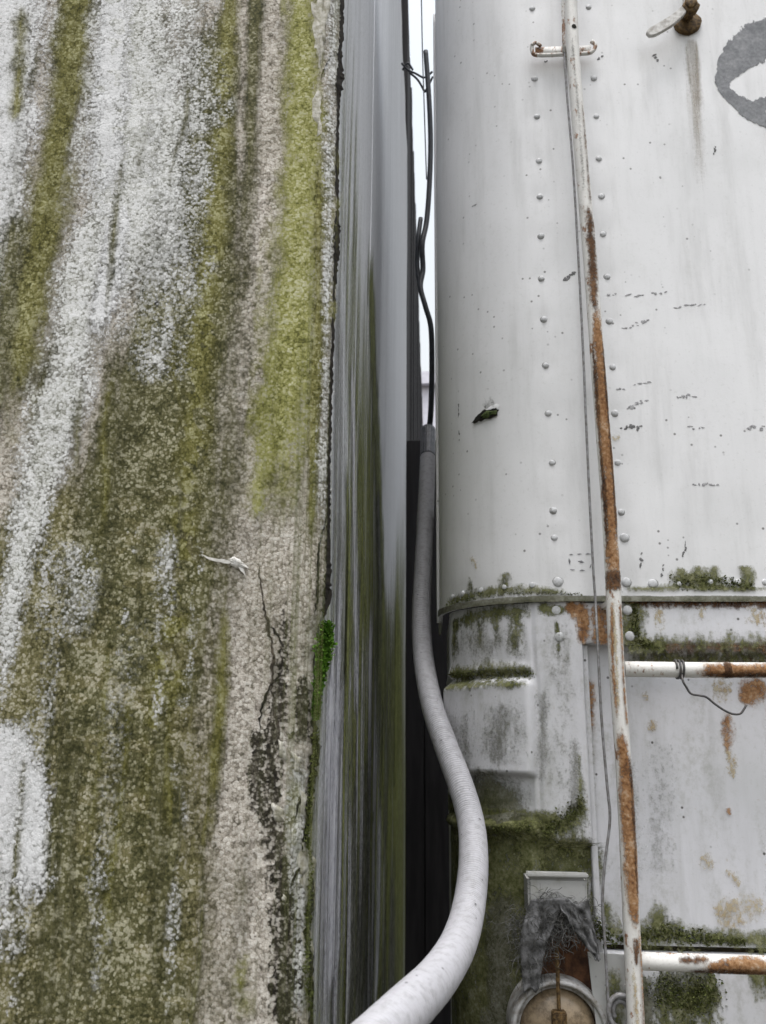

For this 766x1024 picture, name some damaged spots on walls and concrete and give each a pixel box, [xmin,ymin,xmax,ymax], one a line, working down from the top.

leakage [307,0,340,537]
leakage [0,0,266,1024]
leakage [245,349,283,517]
leakage [246,728,270,818]
crack [258,563,286,740]
leakage [291,675,312,742]
leakage [283,891,304,1024]